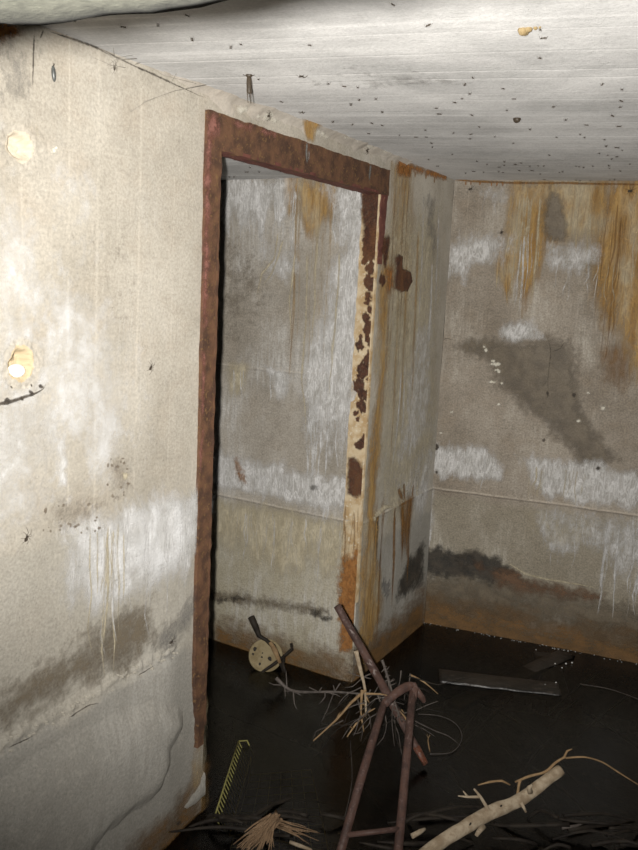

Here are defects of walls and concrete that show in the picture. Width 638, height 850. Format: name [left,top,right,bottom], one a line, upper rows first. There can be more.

spalling [0,325,46,402]
spalling [0,115,58,178]
corrosion [288,178,336,235]
corrosion [338,161,446,652]
corrosion [460,180,638,370]
leakage [462,336,638,509]
leakage [0,495,197,721]
leakage [208,509,638,706]